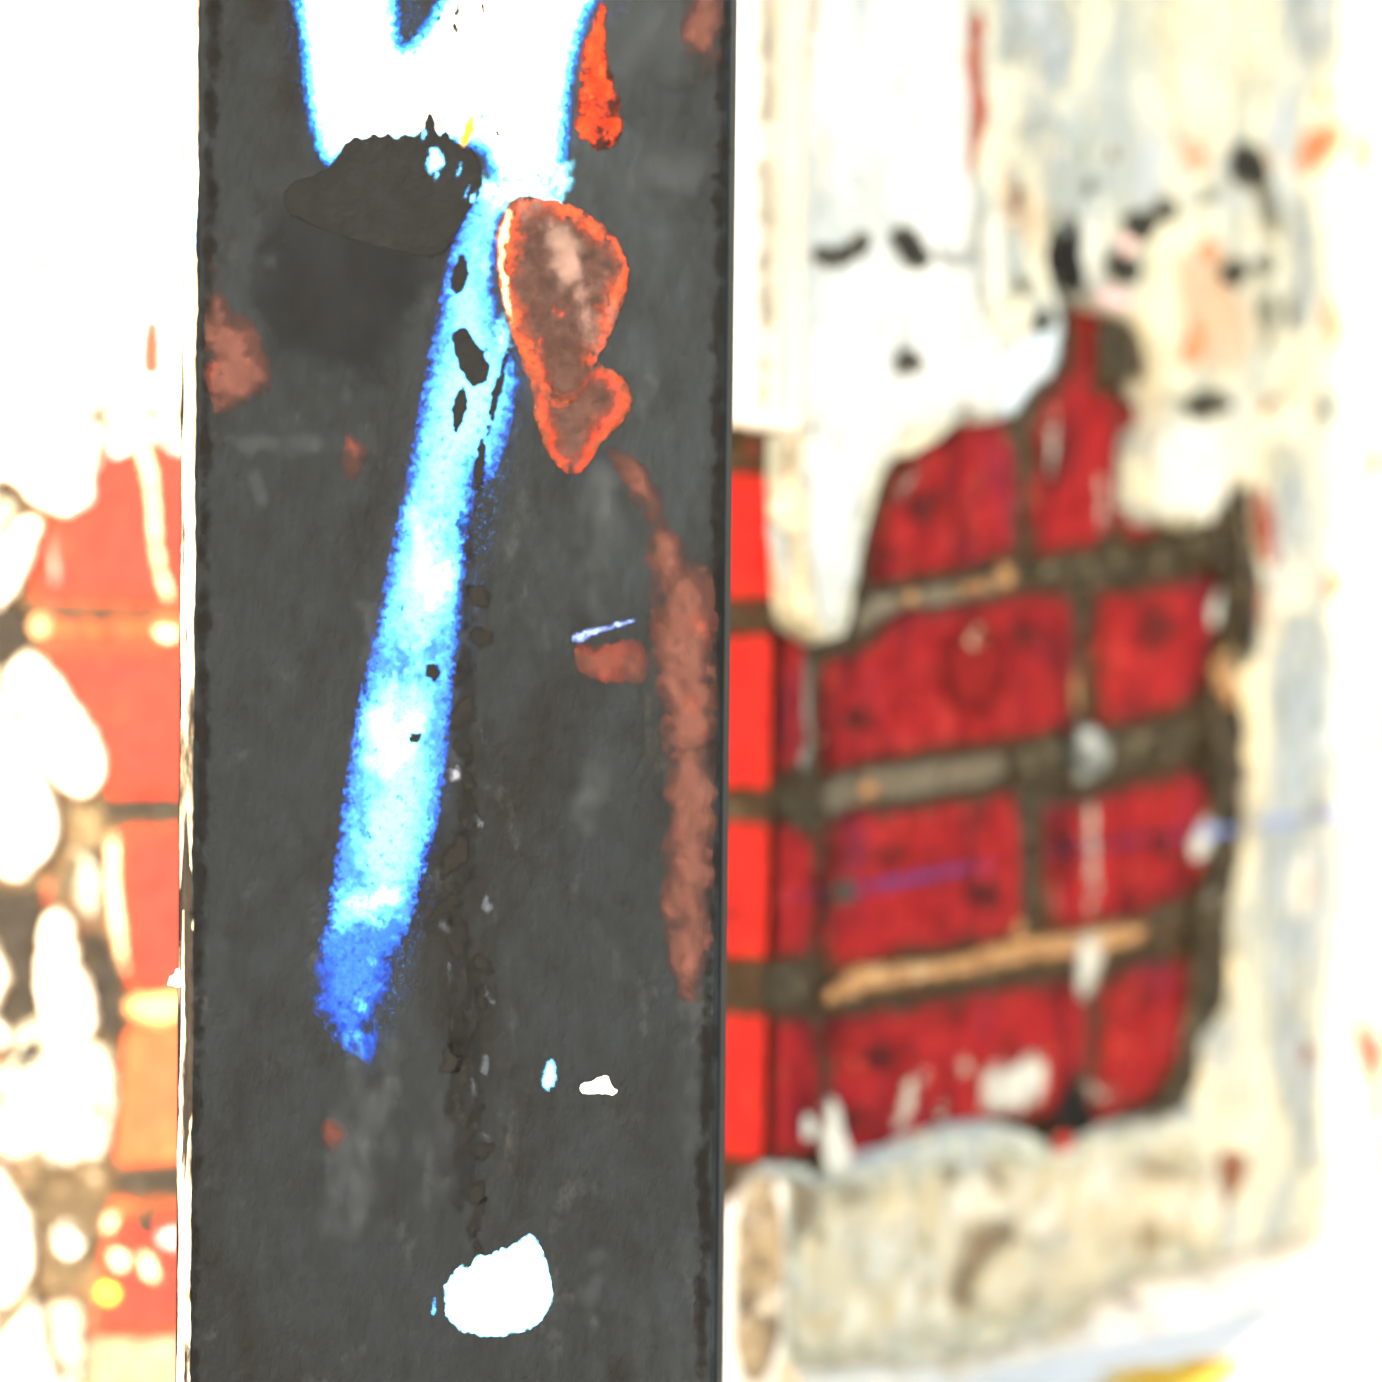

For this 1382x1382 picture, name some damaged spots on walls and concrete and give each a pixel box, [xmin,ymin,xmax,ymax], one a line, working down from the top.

spalling [0,289,184,1382]
rust [574,2,623,150]
rust [495,195,719,1002]
spalling [725,0,1250,1199]